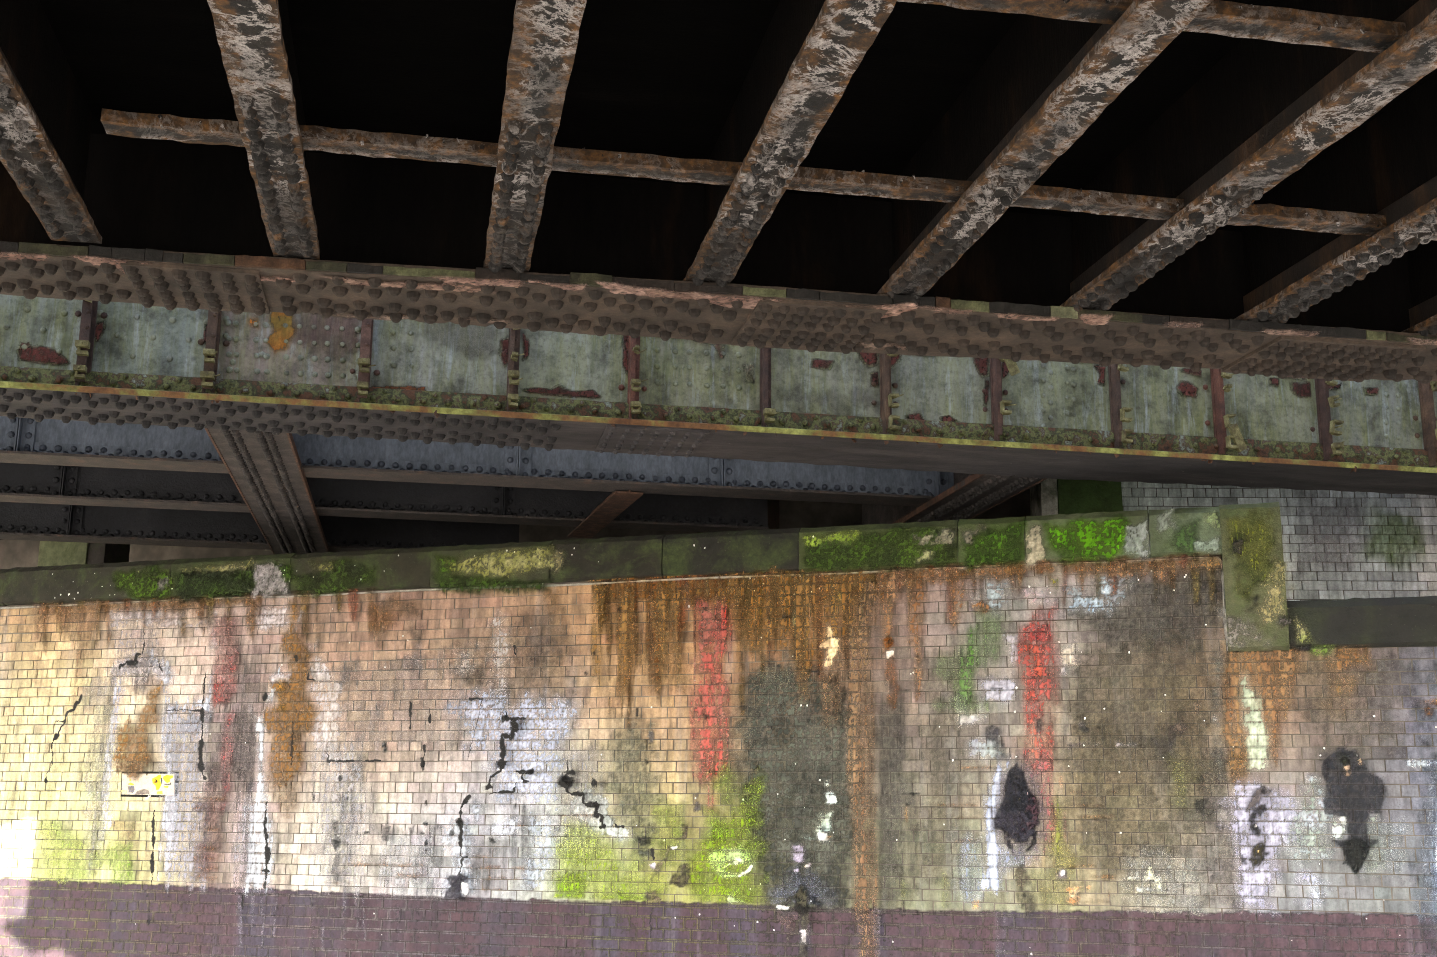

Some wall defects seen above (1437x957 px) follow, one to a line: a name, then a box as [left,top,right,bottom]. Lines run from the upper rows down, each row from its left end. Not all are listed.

rust [249,312,295,351]
crack [44,694,82,783]
crack [263,692,381,765]
damp [310,657,367,894]
crack [409,702,432,767]
damp [382,620,683,900]
crack [456,697,655,876]
damp [690,598,914,912]
rust [591,553,1220,957]
damp [926,562,1392,914]
rust [1221,646,1300,784]
rust [1326,645,1371,695]